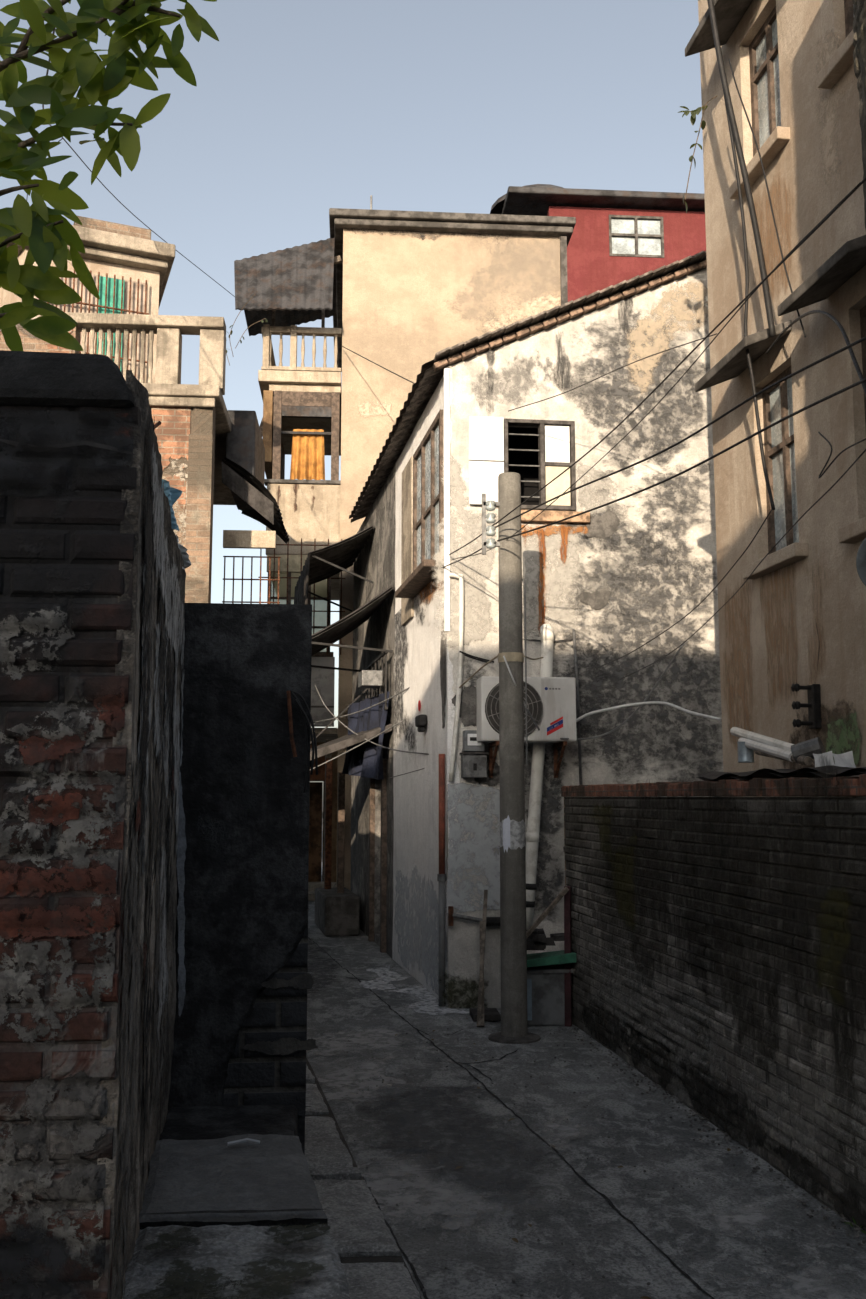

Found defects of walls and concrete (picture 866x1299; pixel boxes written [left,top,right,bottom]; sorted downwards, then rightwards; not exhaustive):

water stain [486,340,495,412]
corrosion [521,525,588,634]
water stain [524,295,822,921]
peeling [0,406,191,1046]
water stain [783,701,857,770]
peeling [0,1070,108,1277]
crack [308,937,715,1299]